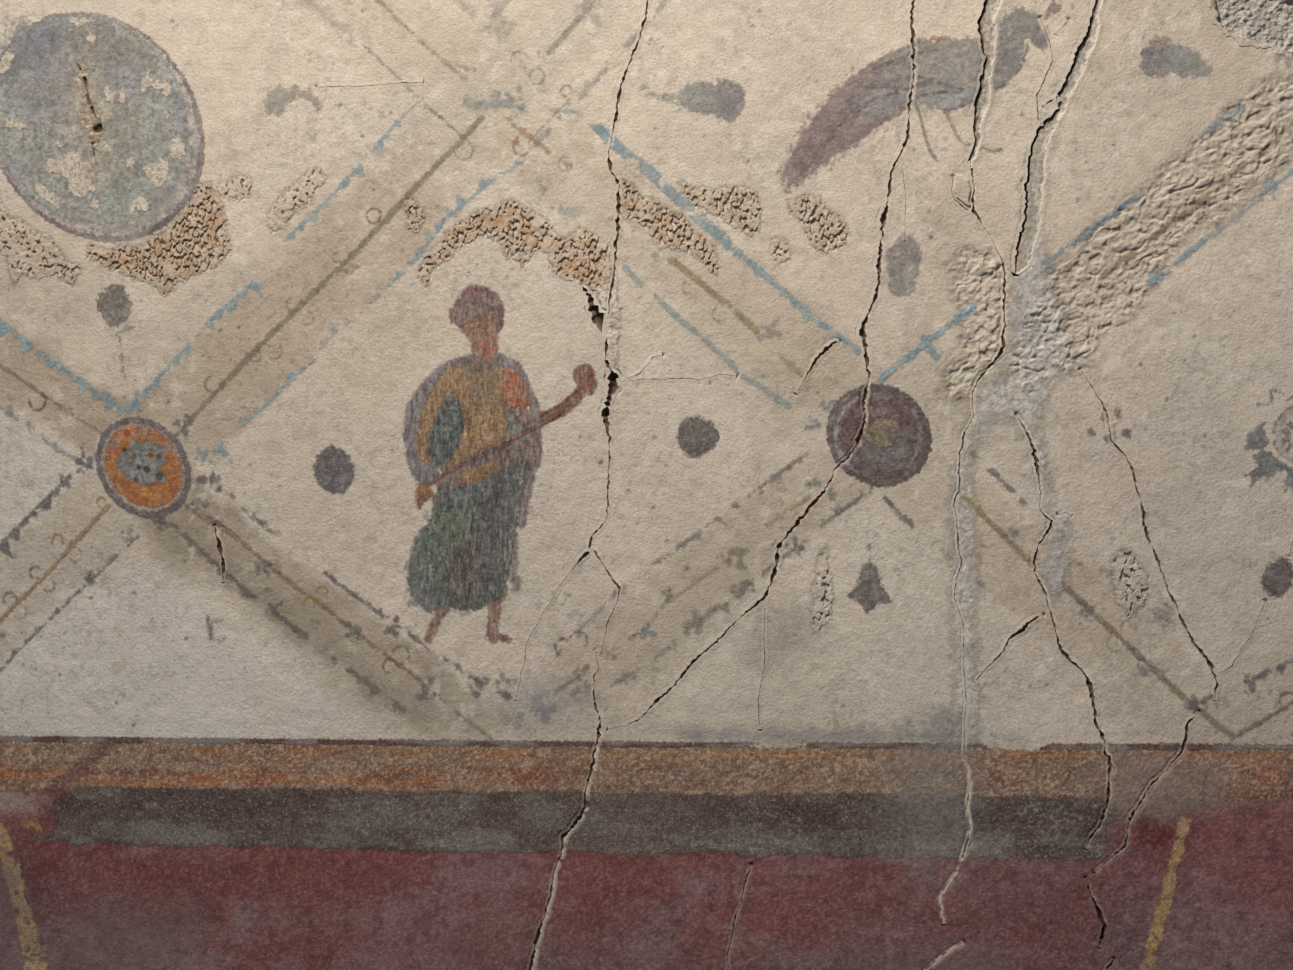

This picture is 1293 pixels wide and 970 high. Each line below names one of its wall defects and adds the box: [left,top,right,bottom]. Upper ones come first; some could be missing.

spalling [0,174,252,297]
spalling [265,166,327,233]
spalling [415,199,622,370]
spalling [622,178,792,275]
spalling [785,194,851,255]
spalling [937,245,1043,402]
spalling [1036,0,1293,376]
crack [512,0,921,970]
crack [923,0,1270,970]